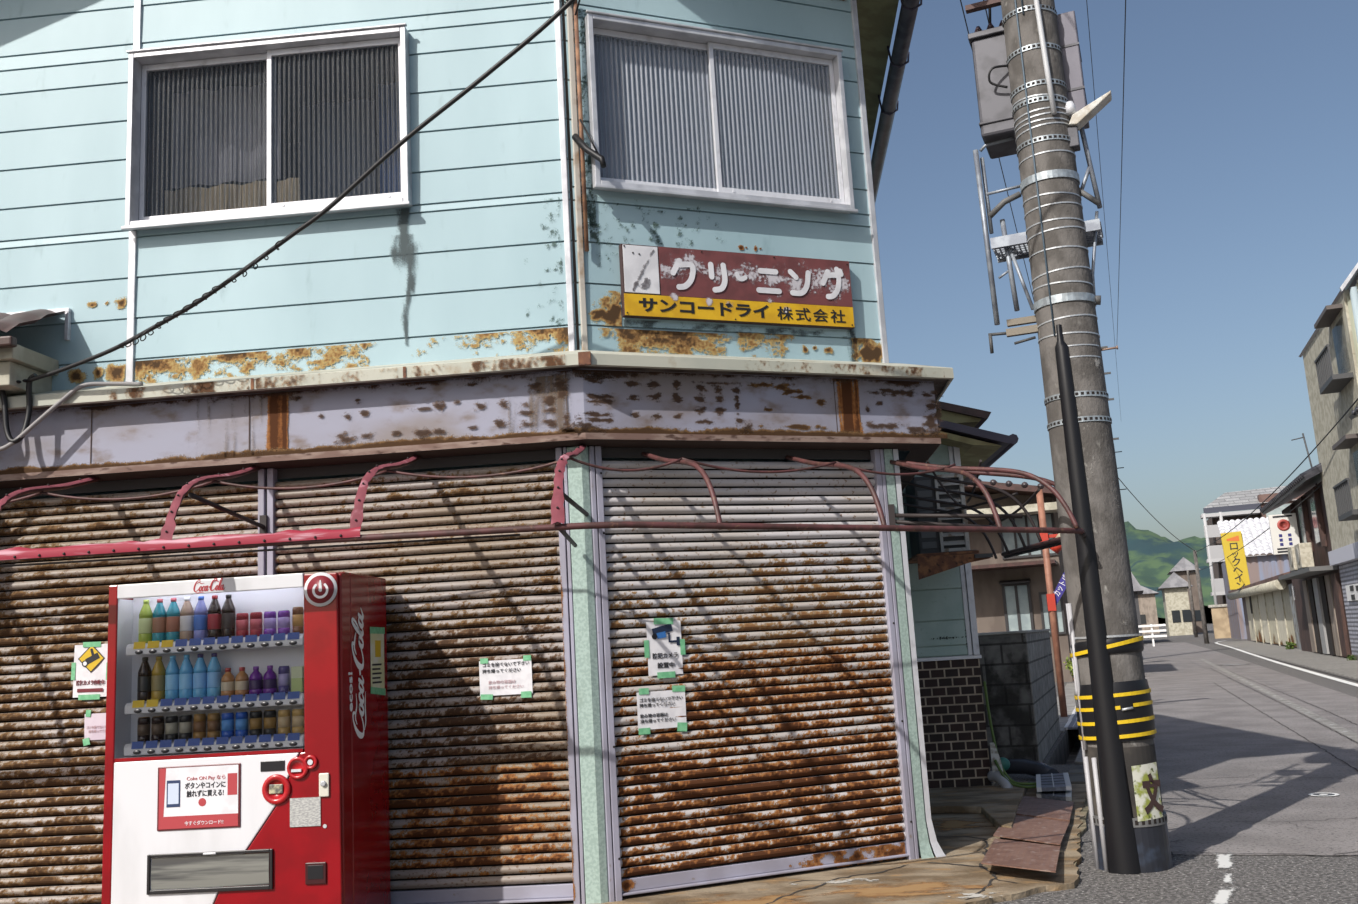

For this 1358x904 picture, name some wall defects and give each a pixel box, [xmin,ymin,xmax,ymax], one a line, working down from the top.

water stain [391,208,415,345]
rust [0,354,948,475]
rust [0,484,257,904]
rust [280,465,575,901]
rust [608,540,906,892]